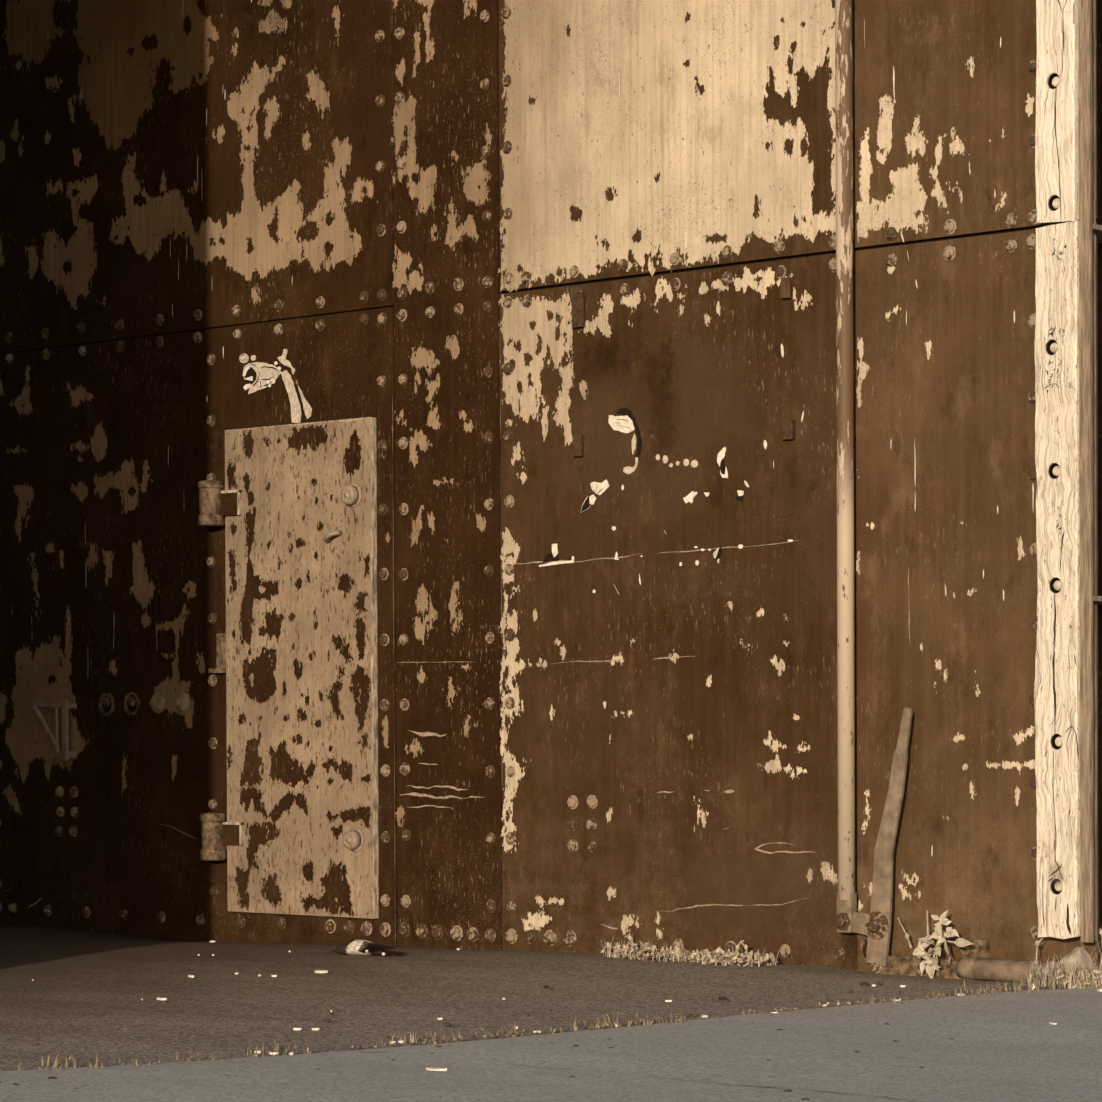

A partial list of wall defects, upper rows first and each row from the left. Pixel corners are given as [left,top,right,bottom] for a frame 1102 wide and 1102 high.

peeling [0,0,378,310]
peeling [390,0,836,446]
peeling [855,95,965,242]
peeling [70,421,154,515]
peeling [393,332,460,468]
peeling [410,505,448,547]
peeling [511,442,527,485]
peeling [0,606,89,815]
peeling [130,540,205,729]
peeling [414,581,463,645]
peeling [499,527,547,854]
peeling [770,655,785,677]